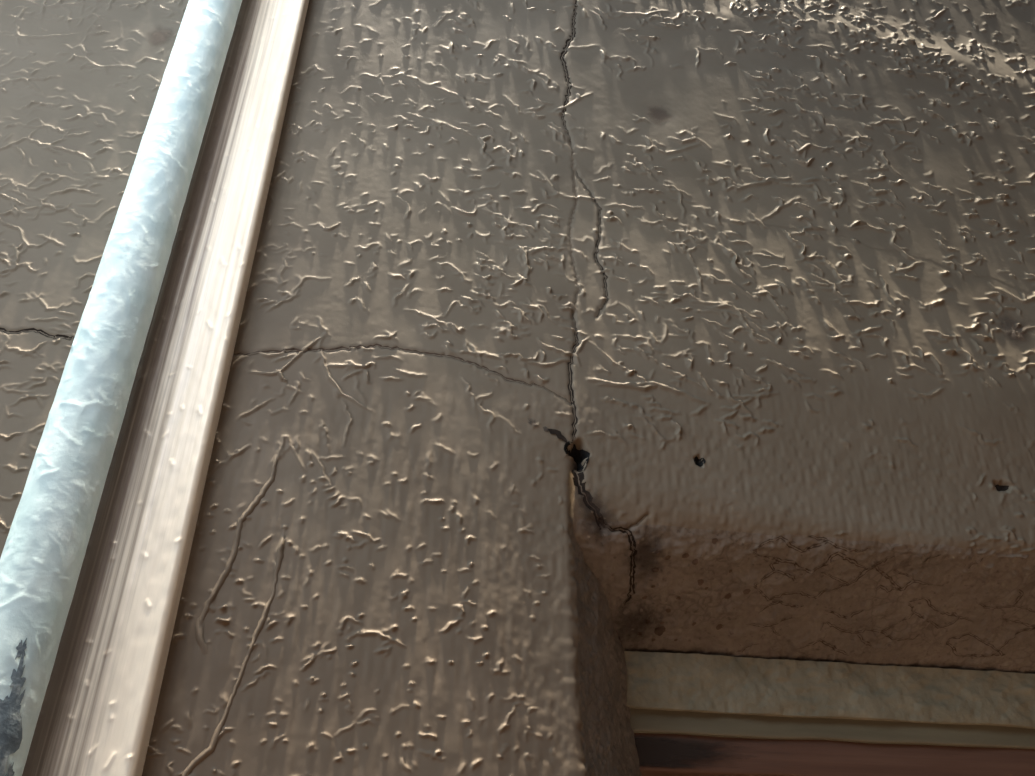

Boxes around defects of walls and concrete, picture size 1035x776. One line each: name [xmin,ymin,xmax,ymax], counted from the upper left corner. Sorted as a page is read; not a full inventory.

crack [0,328,75,340]
crack [235,0,648,608]
crack [738,536,1035,657]